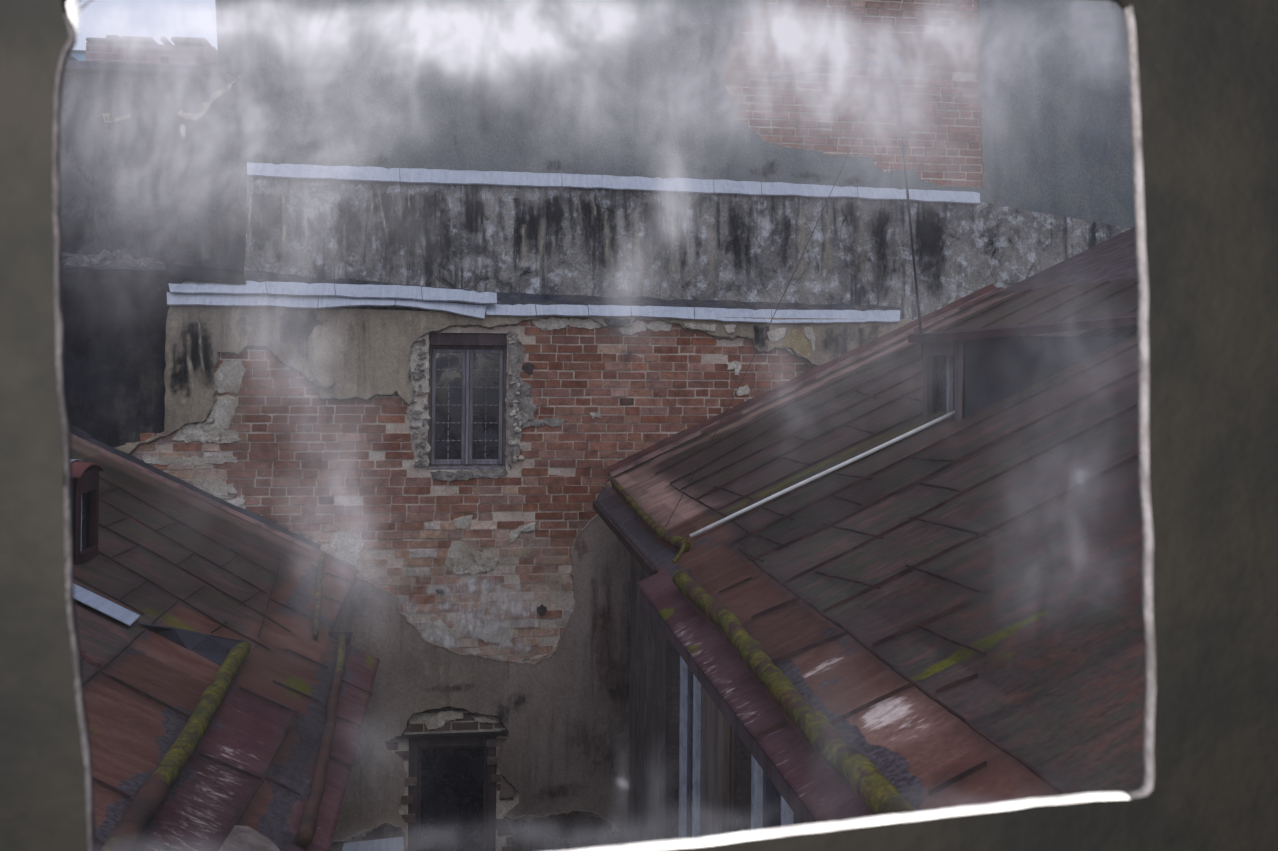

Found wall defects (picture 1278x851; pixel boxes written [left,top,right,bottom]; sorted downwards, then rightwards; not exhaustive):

spalling [722,0,985,188]
leakage [247,179,629,266]
leakage [637,203,804,274]
leakage [171,323,212,397]
spalling [126,316,817,665]
spalling [332,706,619,851]